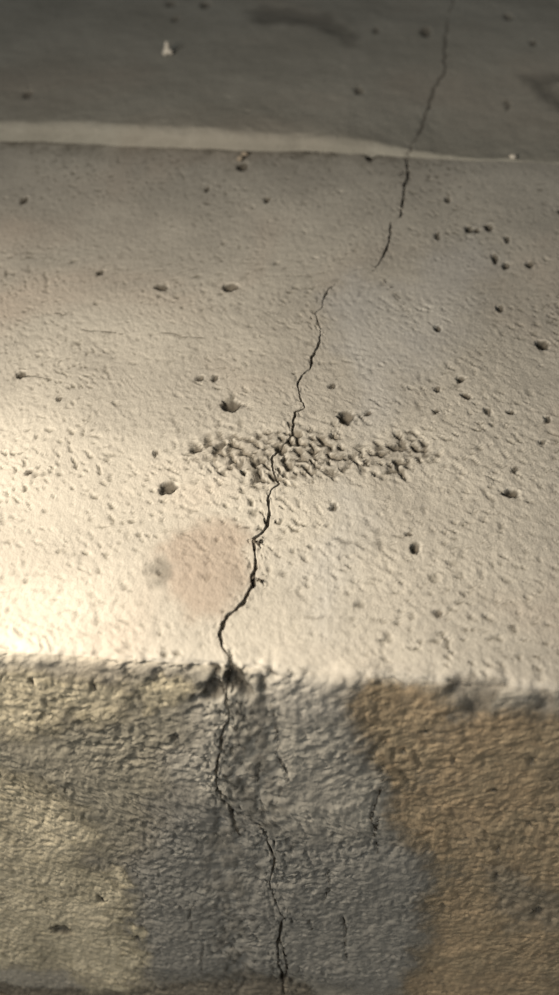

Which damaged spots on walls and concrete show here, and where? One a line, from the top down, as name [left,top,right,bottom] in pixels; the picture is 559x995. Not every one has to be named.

crack [371,1,454,315]
crack [218,285,334,811]
crack [277,870,347,990]
crack [369,766,384,853]